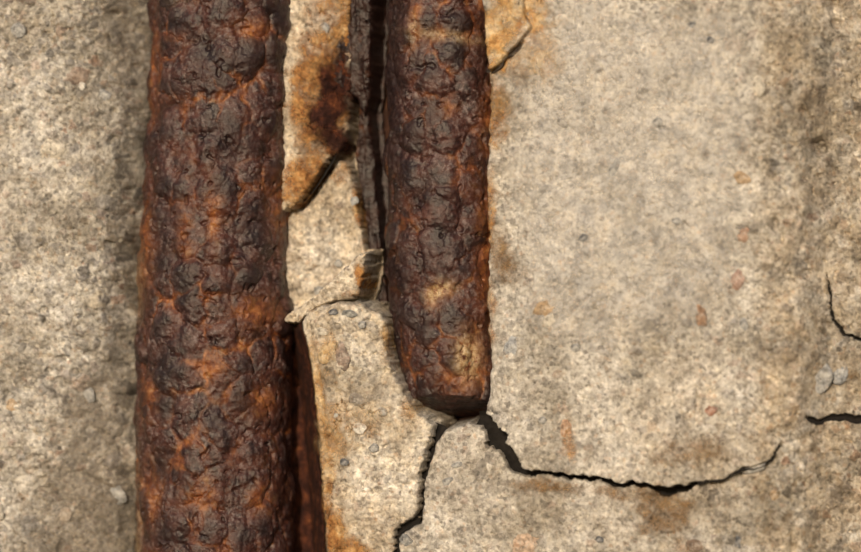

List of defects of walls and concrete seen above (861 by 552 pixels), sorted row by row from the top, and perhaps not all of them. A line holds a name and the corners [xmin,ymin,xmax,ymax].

spalling [24,0,295,552]
rust [282,0,357,209]
rust [353,189,367,227]
rust [354,265,377,289]
spalling [382,0,522,418]
spalling [527,0,729,334]
rust [290,319,366,552]
crack [394,422,448,552]
crack [477,411,782,497]